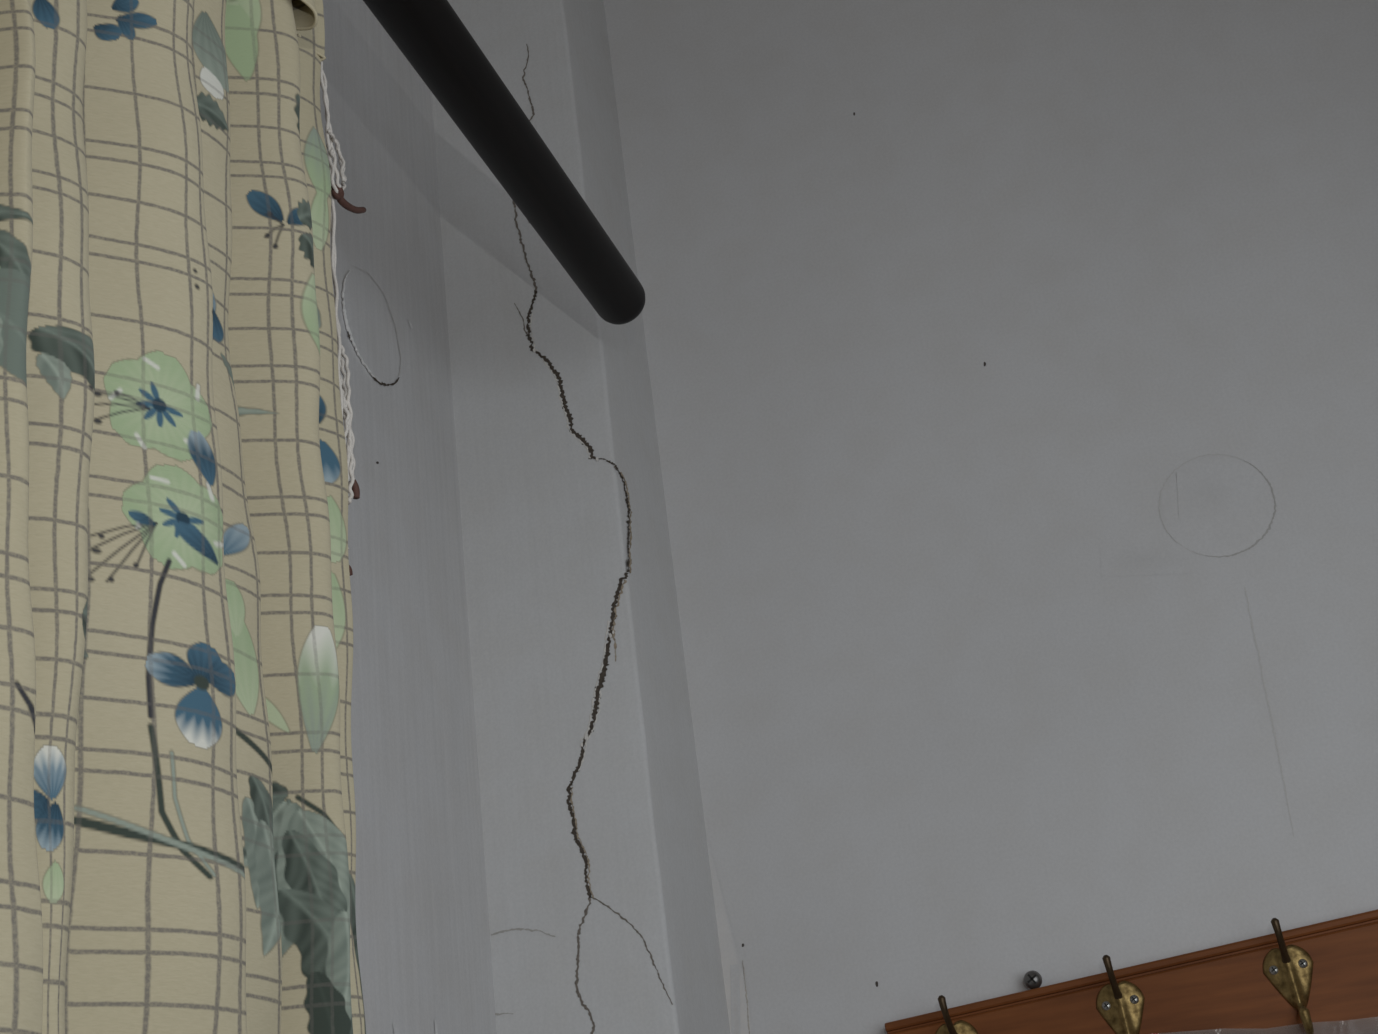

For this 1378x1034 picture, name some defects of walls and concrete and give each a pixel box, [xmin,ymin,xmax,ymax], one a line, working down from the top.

crack [522,44,535,121]
crack [491,201,673,1034]